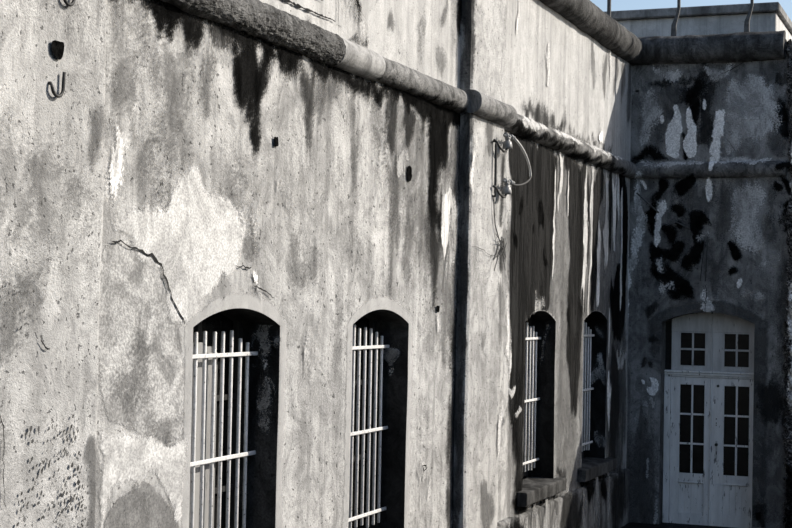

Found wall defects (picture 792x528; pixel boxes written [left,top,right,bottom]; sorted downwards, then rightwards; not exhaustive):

water stain [130,0,478,528]
water stain [592,38,639,122]
water stain [498,63,743,528]
water stain [768,98,792,233]